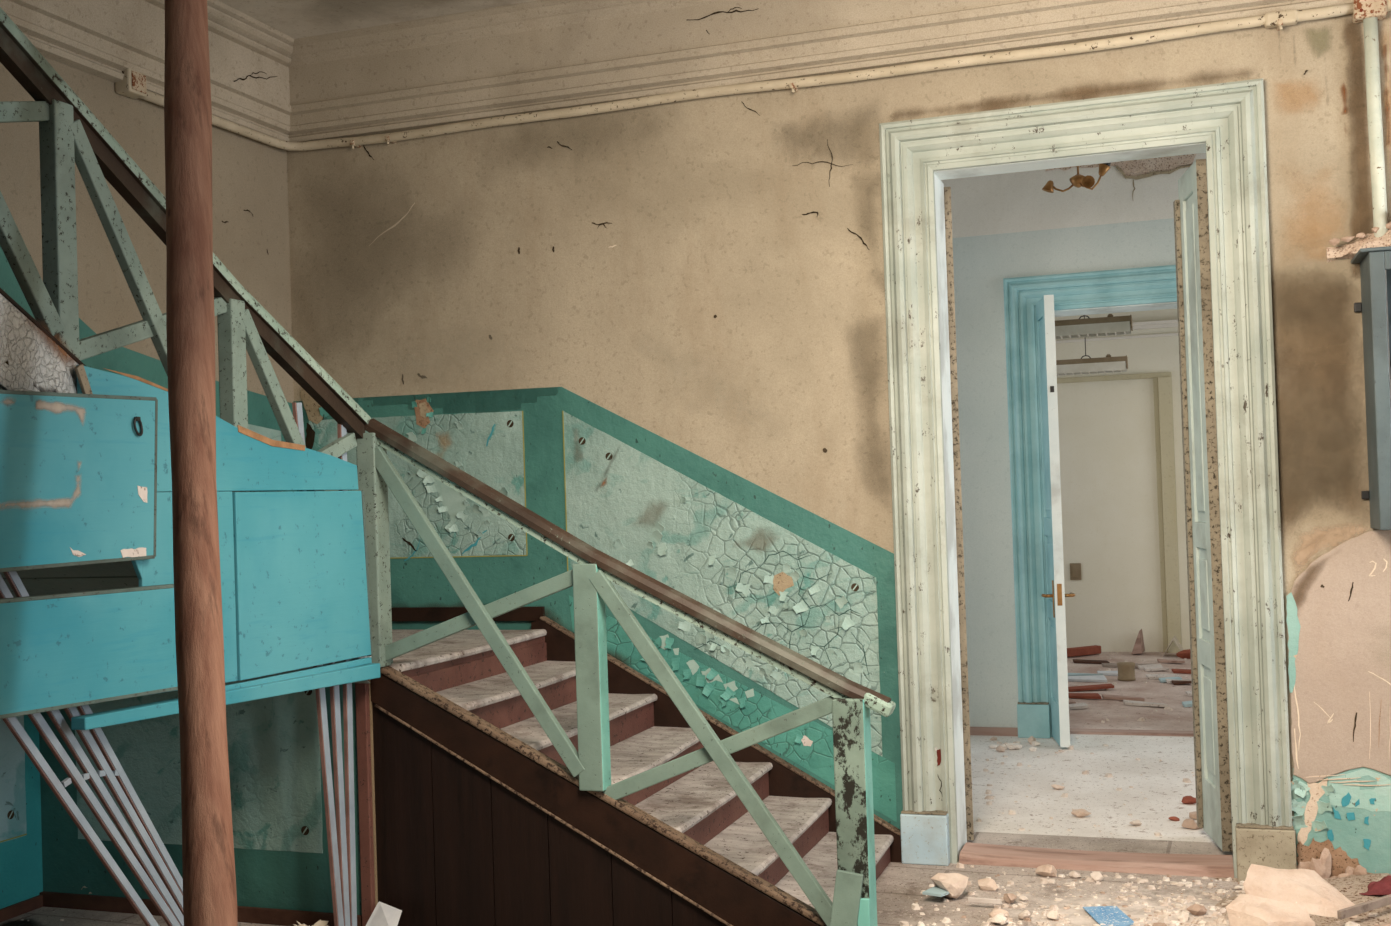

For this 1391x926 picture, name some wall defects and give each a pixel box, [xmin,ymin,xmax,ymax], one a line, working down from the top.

crack [687,7,759,34]
crack [793,139,868,248]
flaking render [1046,154,1196,199]
flaking render [406,397,433,442]
peeling [408,469,491,554]
peeling [655,621,783,708]
peeling [708,551,869,674]
peeling [1286,593,1301,693]
peeling [795,734,813,746]
peeling [1291,767,1391,879]